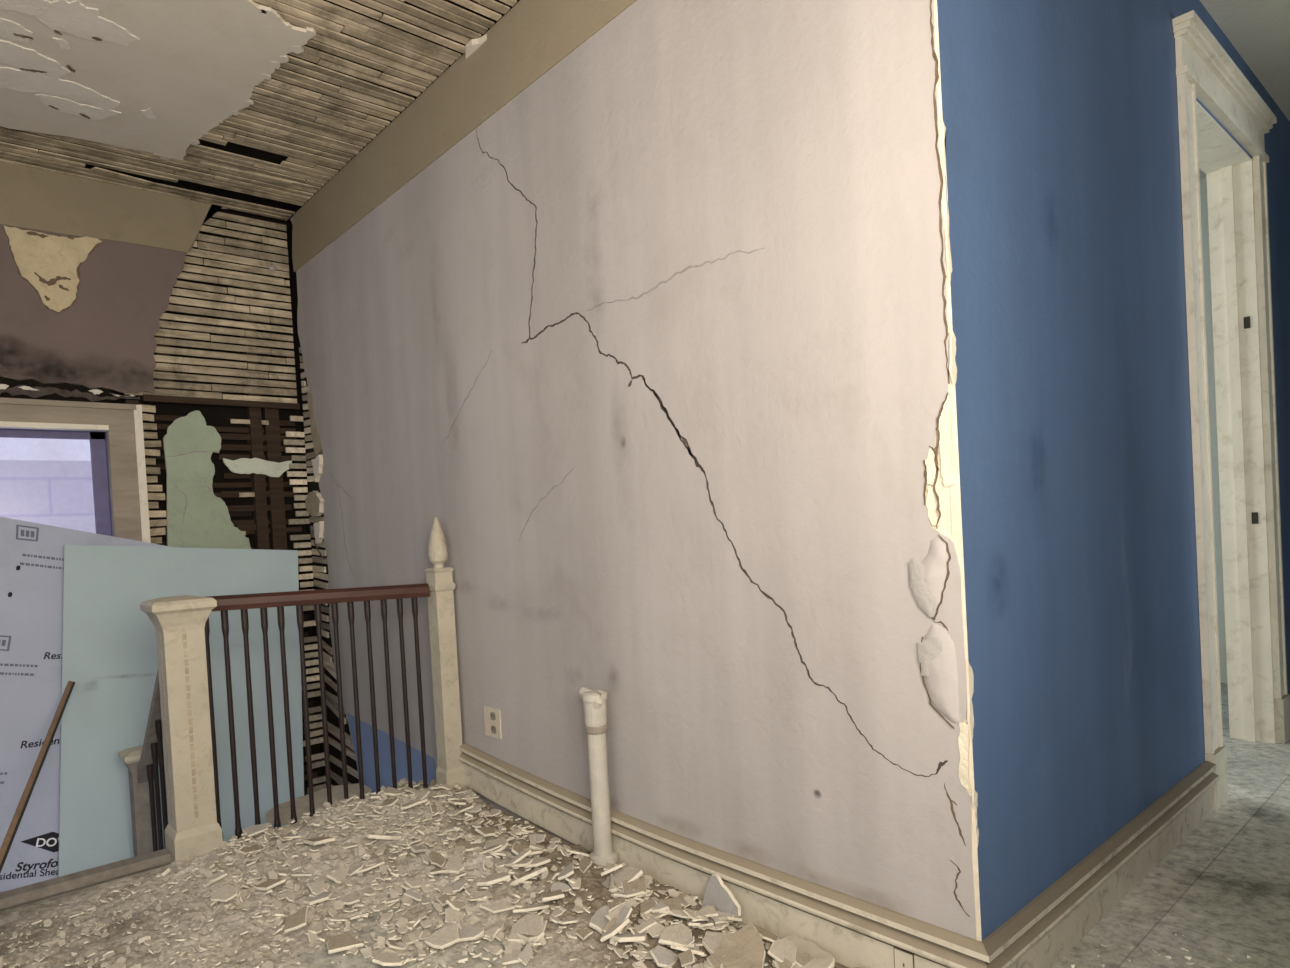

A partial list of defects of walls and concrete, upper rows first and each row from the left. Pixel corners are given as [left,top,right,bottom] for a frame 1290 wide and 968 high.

flaking render [0,0,517,796]
crack [476,130,970,917]
spalling [958,659,979,849]